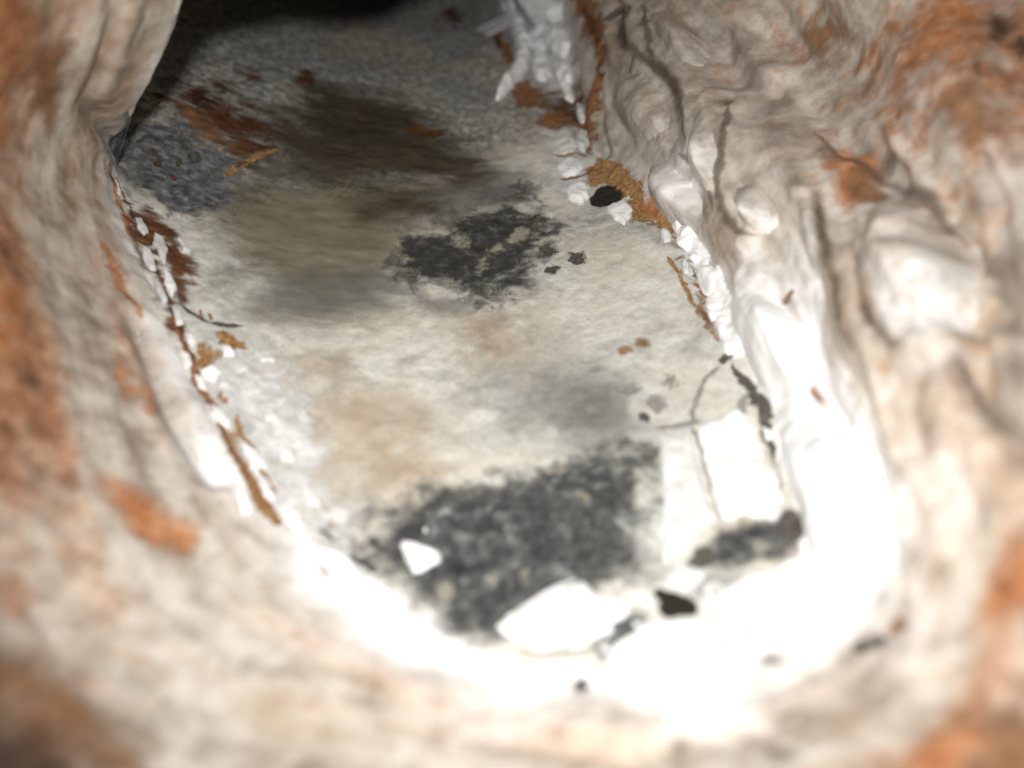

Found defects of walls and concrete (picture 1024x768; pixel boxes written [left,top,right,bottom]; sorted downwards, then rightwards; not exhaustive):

corrosion [156,70,292,176]
corrosion [108,148,139,249]
water stain [109,87,563,317]
peeling [607,198,633,225]
corrosion [102,242,142,317]
water stain [155,264,316,551]
crack [654,354,783,519]
water stain [355,438,663,639]
water stain [686,508,805,570]